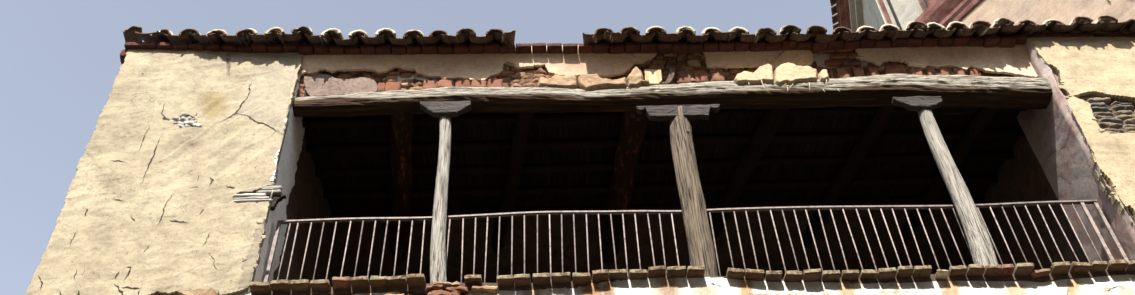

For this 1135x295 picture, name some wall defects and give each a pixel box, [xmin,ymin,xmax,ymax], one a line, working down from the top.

crack [220,78,281,134]
peeling [304,73,402,97]
peeling [422,66,650,91]
peeling [663,49,981,92]